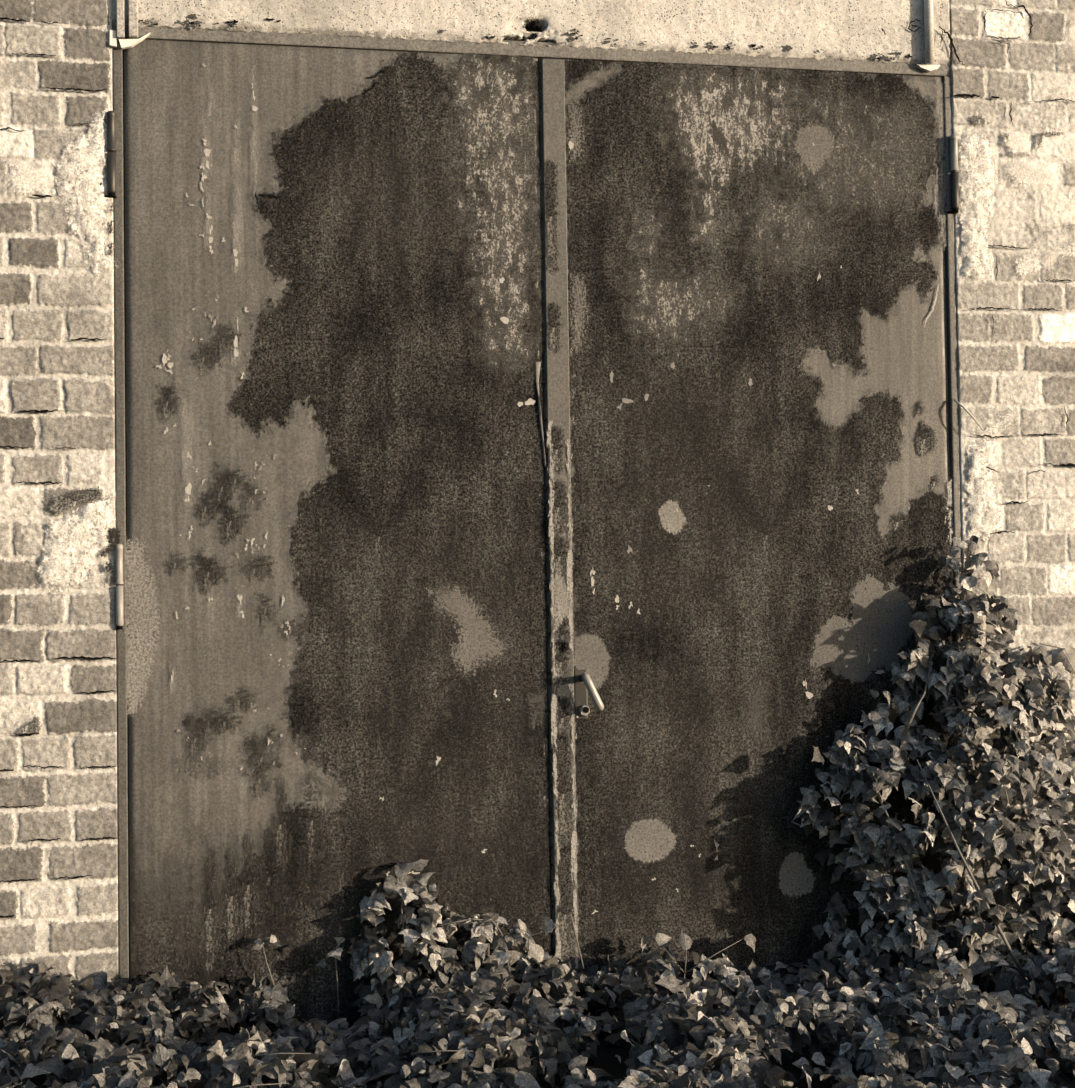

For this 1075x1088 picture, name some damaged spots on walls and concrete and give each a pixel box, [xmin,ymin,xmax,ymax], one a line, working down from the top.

leakage [1003,132,1043,188]
leakage [1016,254,1043,277]
corrosion [153,51,554,970]
corrosion [564,58,959,983]
corrosion [579,985,622,1016]